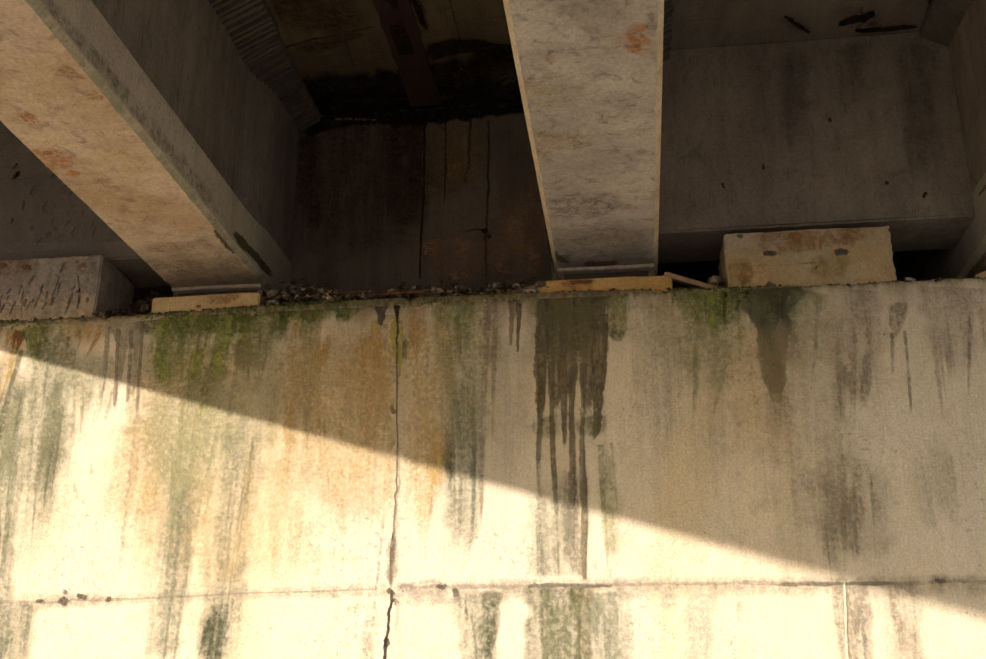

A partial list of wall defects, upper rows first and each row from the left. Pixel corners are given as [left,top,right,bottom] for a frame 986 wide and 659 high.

crack [419,119,492,278]
water stain [0,308,358,659]
crack [365,305,406,659]
water stain [436,300,522,522]
water stain [526,296,626,659]
water stain [677,287,821,412]
water stain [834,583,871,659]